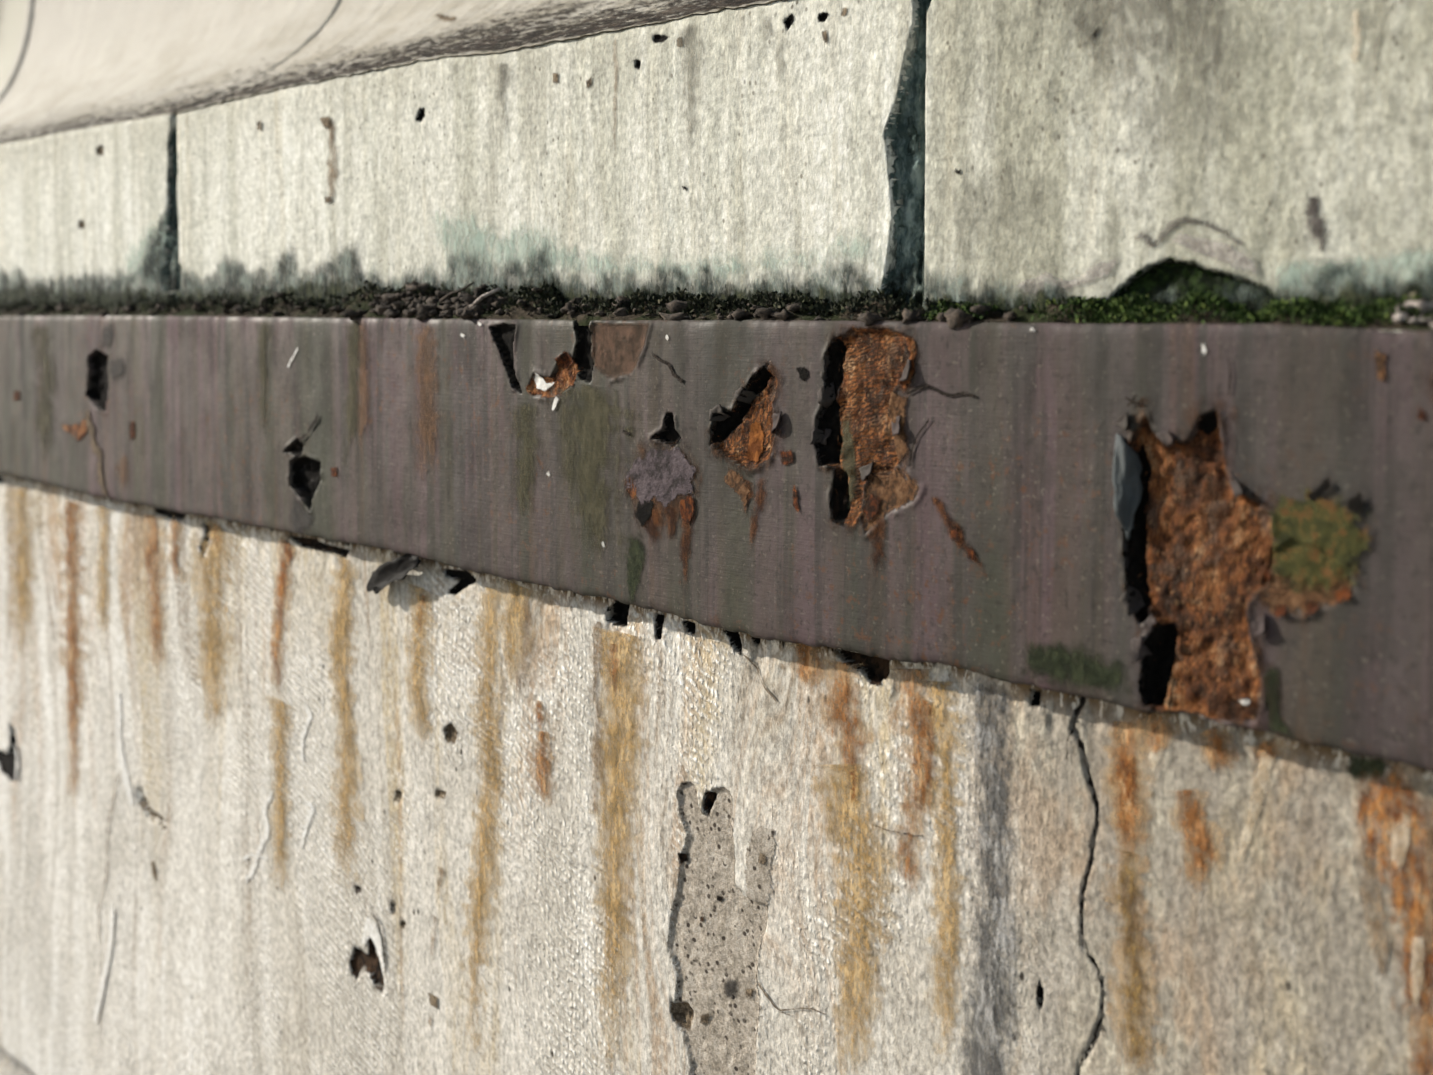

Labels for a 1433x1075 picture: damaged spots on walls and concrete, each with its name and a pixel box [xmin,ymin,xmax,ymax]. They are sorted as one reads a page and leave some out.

corrosion [489,323,648,411]
corrosion [624,436,702,602]
corrosion [708,362,794,542]
corrosion [810,324,982,564]
spalling [0,725,19,782]
corrosion [1106,398,1376,1058]
spalling [349,902,406,990]
peeling [666,782,775,1075]
damp [960,683,1018,1075]
crack [1066,696,1104,1075]